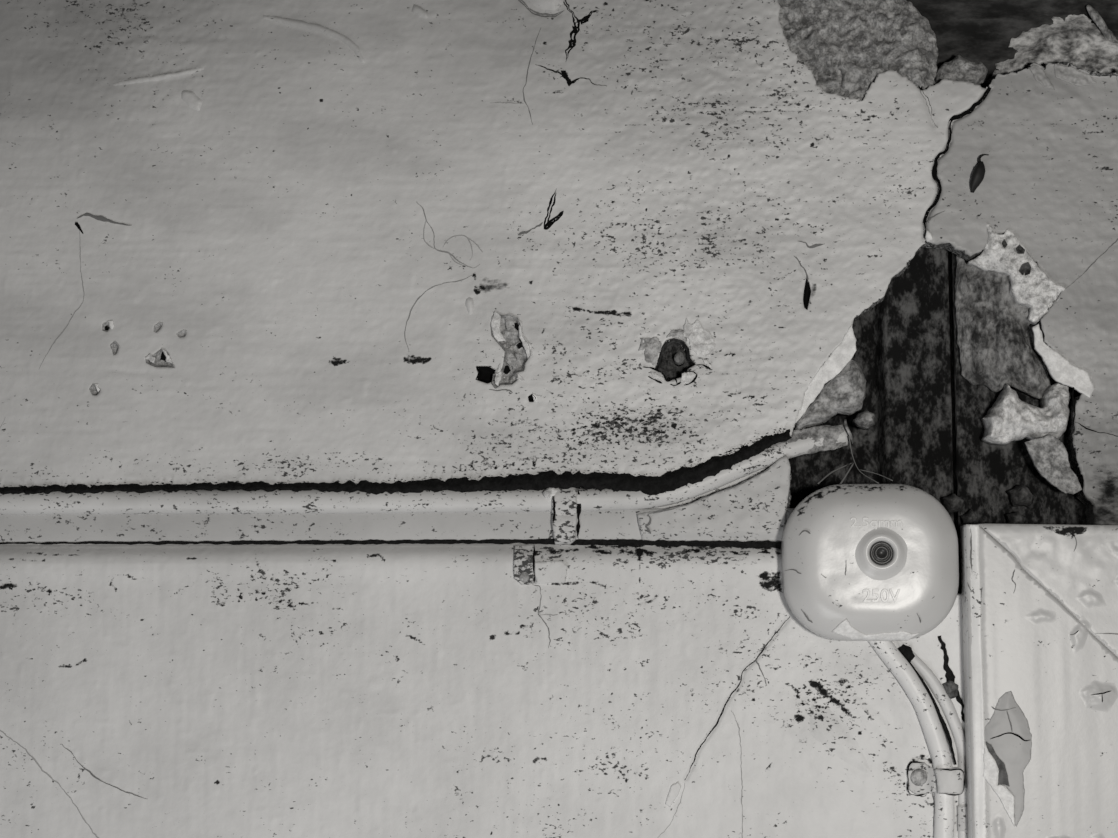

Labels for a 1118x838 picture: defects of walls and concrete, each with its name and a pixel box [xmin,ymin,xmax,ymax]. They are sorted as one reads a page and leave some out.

crack [494,0,606,124]
flaking render [778,0,938,101]
crack [918,85,991,241]
flaking render [489,311,532,393]
flaking render [794,325,866,430]
flaking render [967,223,1095,398]
peeling [1025,435,1082,495]
crack [967,530,982,596]
crack [0,730,98,838]
crack [63,746,146,799]
crack [660,617,790,838]
peeling [983,691,1032,827]